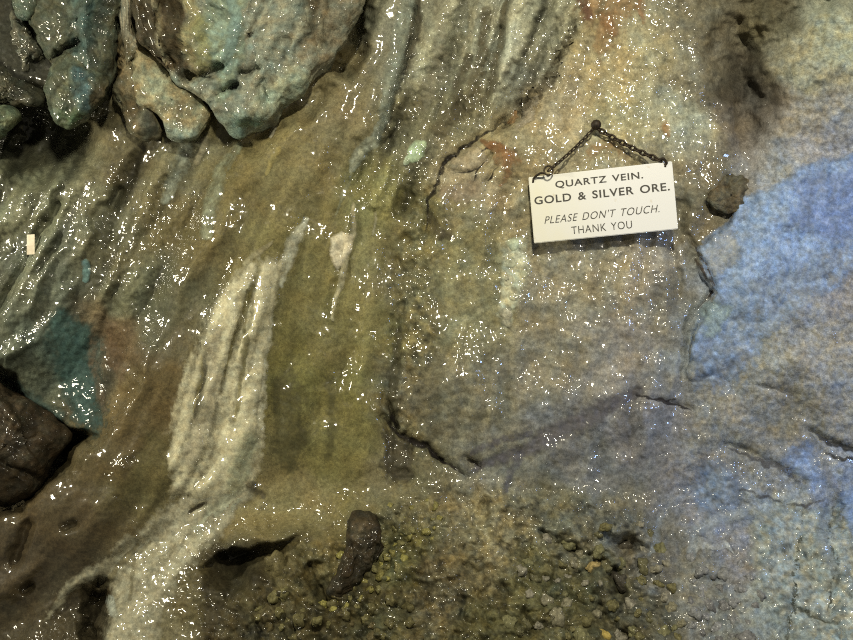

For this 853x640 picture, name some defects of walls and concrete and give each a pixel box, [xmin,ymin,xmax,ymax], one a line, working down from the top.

crack [426,128,498,228]
crack [636,395,689,409]
crack [387,404,481,475]